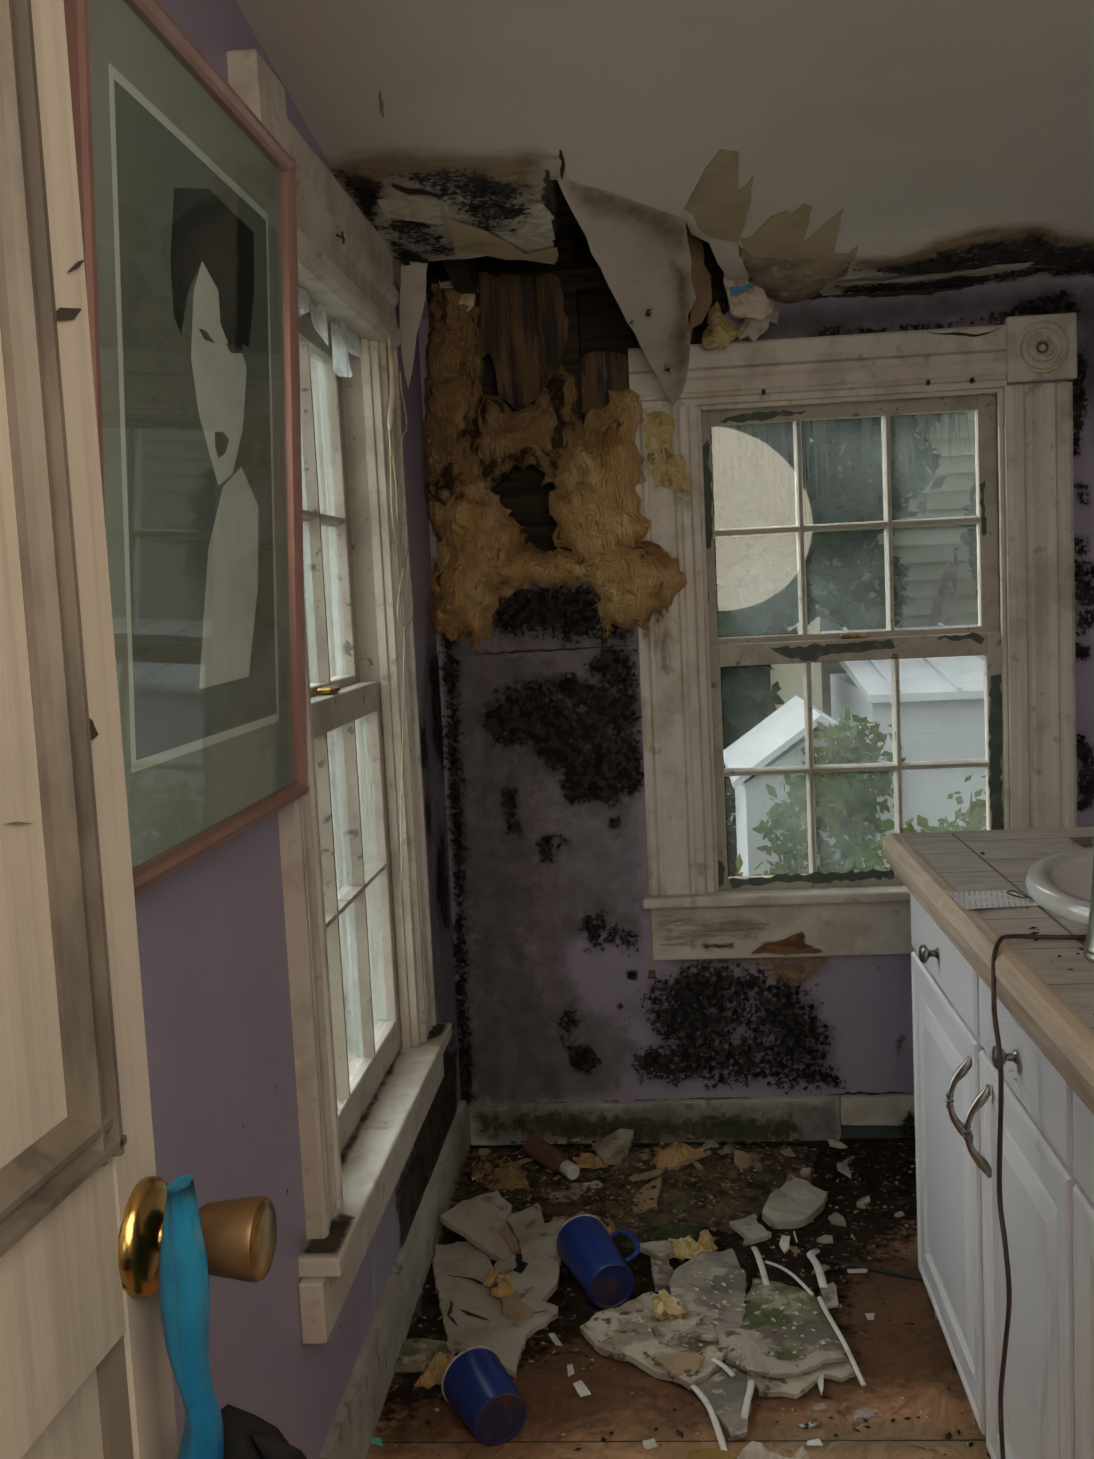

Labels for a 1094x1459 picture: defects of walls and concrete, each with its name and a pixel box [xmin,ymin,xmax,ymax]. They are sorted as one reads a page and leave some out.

peeling [377,196,555,254]
peeling [399,261,428,389]
spalling [686,227,779,343]
leakage [779,227,1094,458]
peeling [702,441,713,549]
mould [1074,481,1090,505]
mould [1074,535,1094,661]
peeling [988,674,1004,830]
mould [1076,734,1094,811]
leakage [396,584,846,1248]
peeling [718,860,894,889]
leakage [1070,837,1094,848]